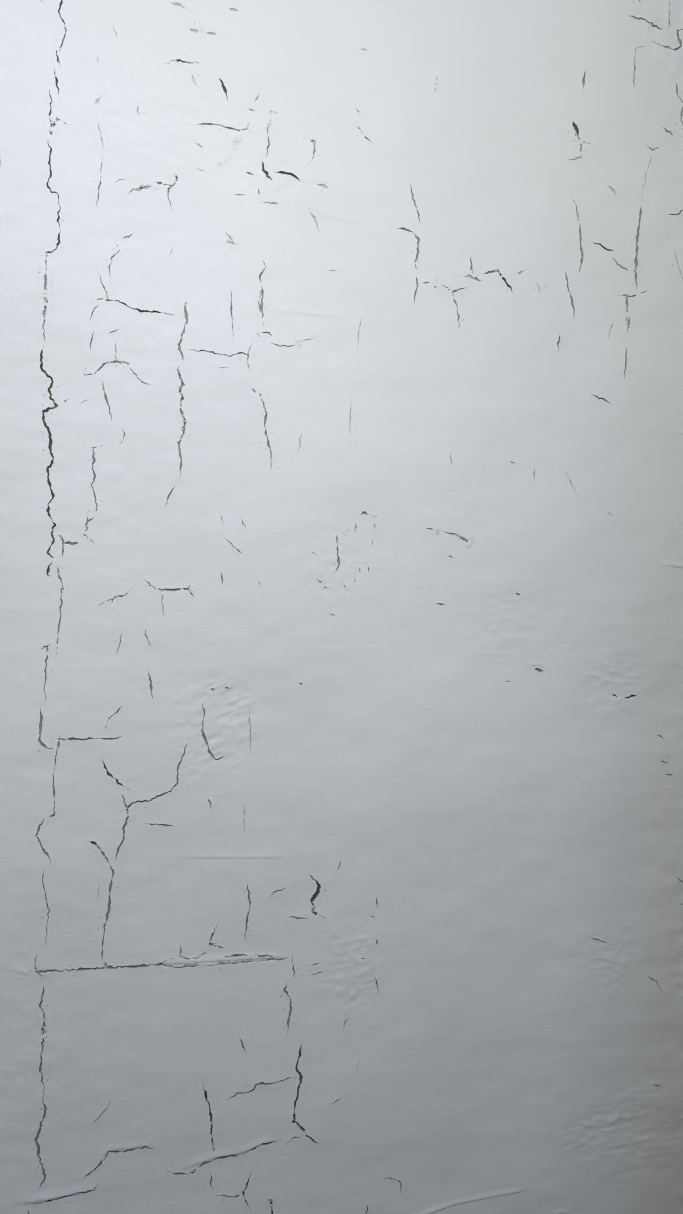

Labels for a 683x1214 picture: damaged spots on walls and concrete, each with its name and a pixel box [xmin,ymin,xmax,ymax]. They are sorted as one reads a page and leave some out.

crack [21,0,386,1214]
crack [388,0,683,412]